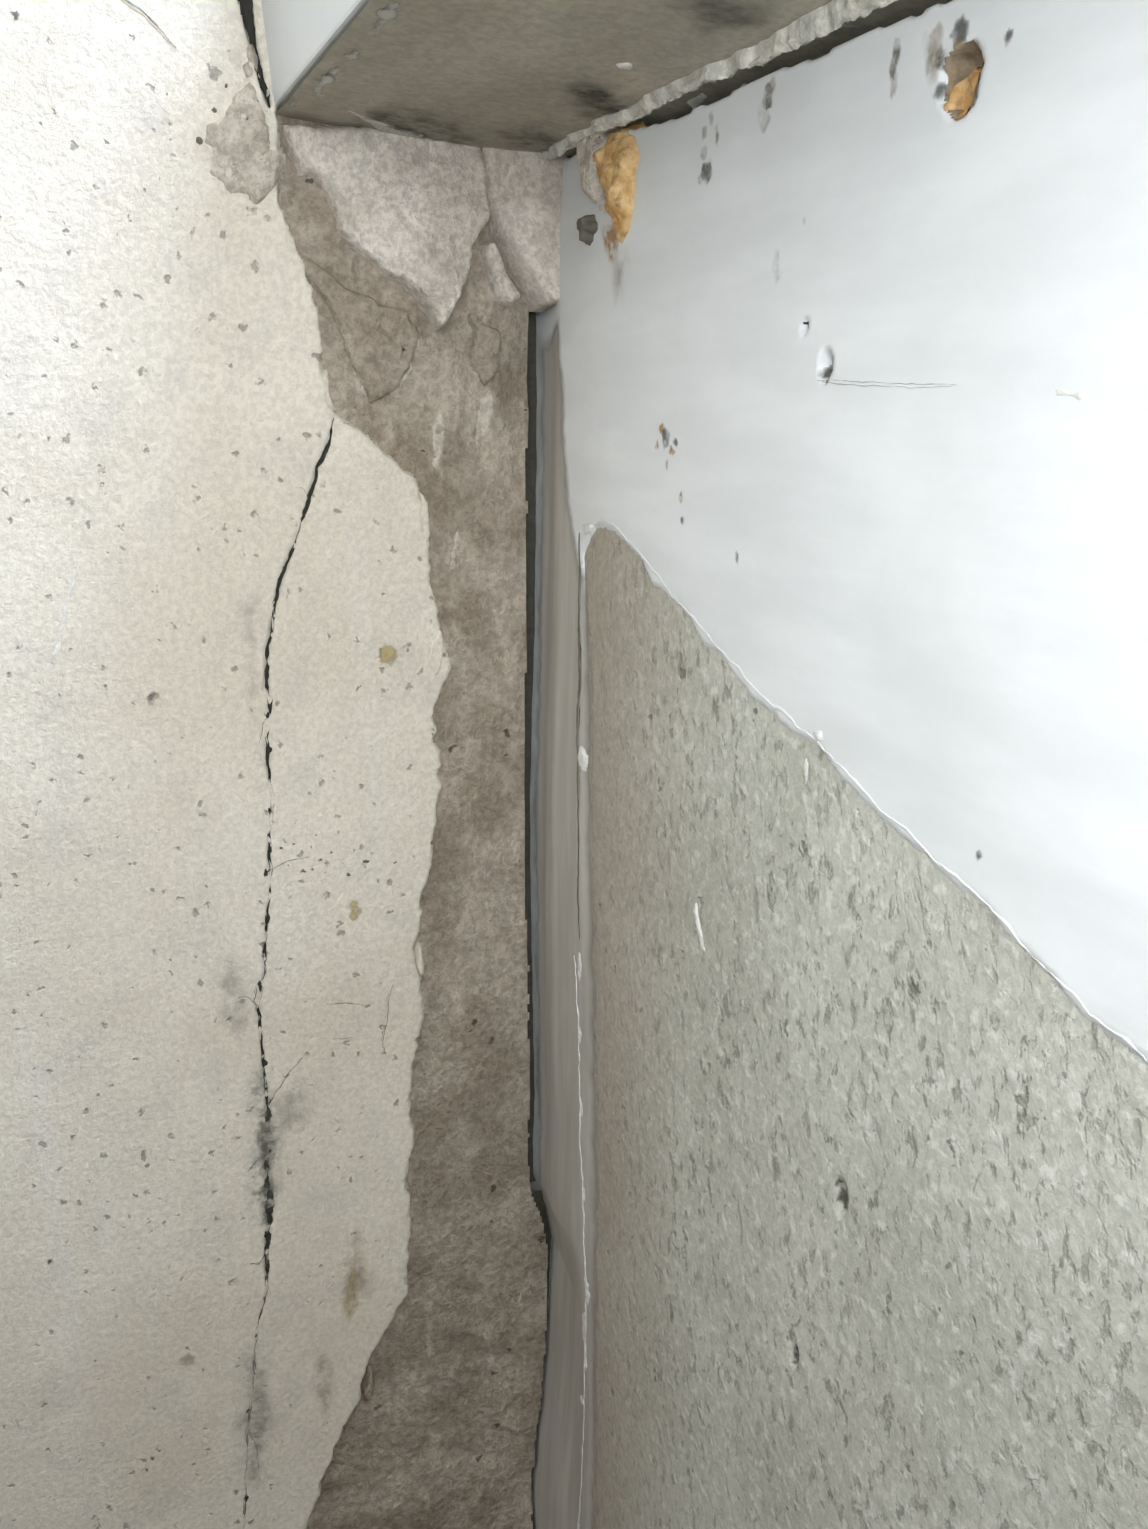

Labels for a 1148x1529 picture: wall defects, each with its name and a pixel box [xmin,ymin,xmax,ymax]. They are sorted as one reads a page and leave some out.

flaking render [243,39,260,77]
rust [576,120,647,258]
crack [238,418,334,1528]
crack [529,1440,537,1521]
crack [524,312,551,1388]
peeling [196,82,1148,1529]